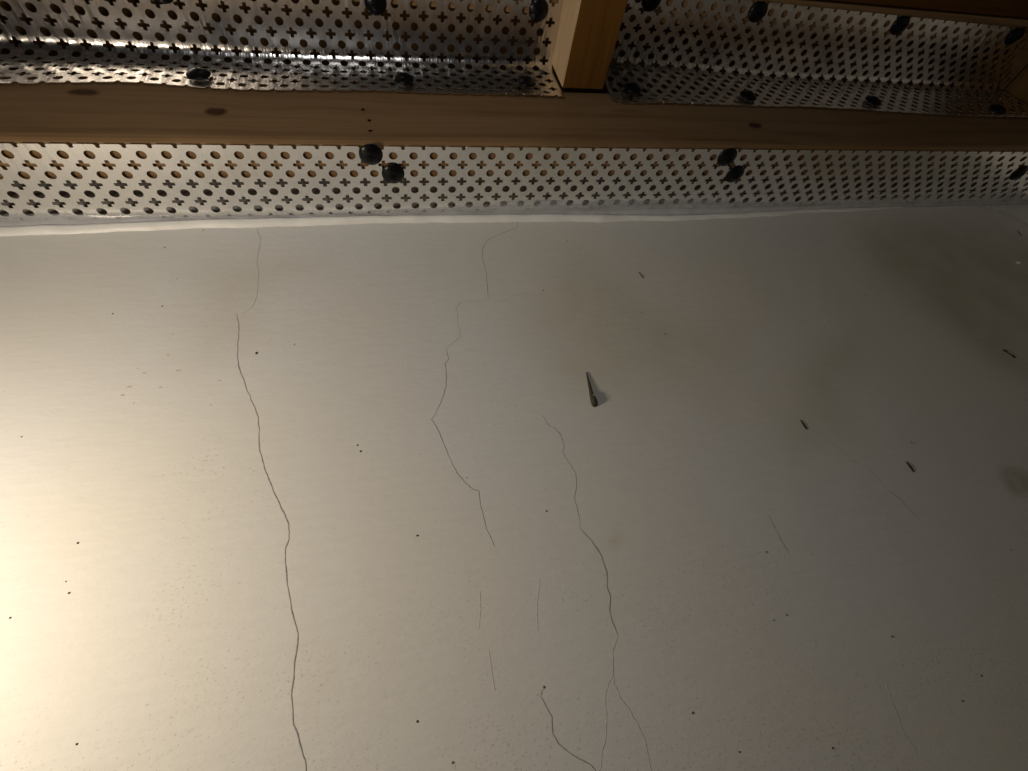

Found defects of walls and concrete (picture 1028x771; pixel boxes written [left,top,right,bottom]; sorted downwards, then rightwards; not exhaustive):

crack [163,227,307,771]
crack [411,222,527,547]
crack [540,417,651,771]